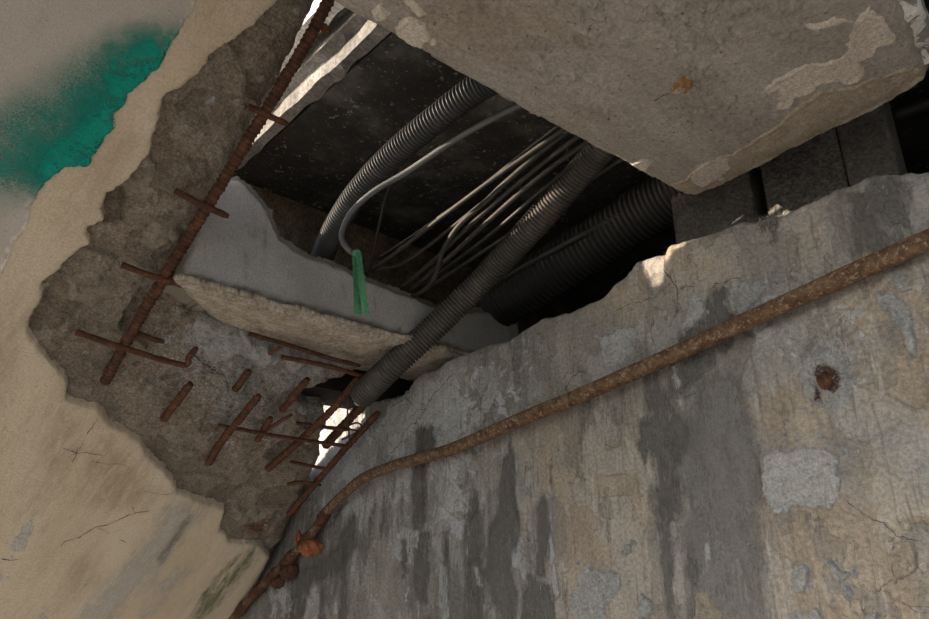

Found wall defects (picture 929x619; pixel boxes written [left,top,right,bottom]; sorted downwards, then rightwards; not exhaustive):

peeling [395,0,437,48]
peeling [657,6,928,194]
spalling [75,0,380,517]
corrosion [796,351,857,415]
crack [63,419,103,464]
water stain [415,426,435,453]
peeling [761,433,849,515]
crack [61,491,172,546]
corrosion [233,509,331,618]
water stain [401,462,450,619]
water stain [464,440,559,619]